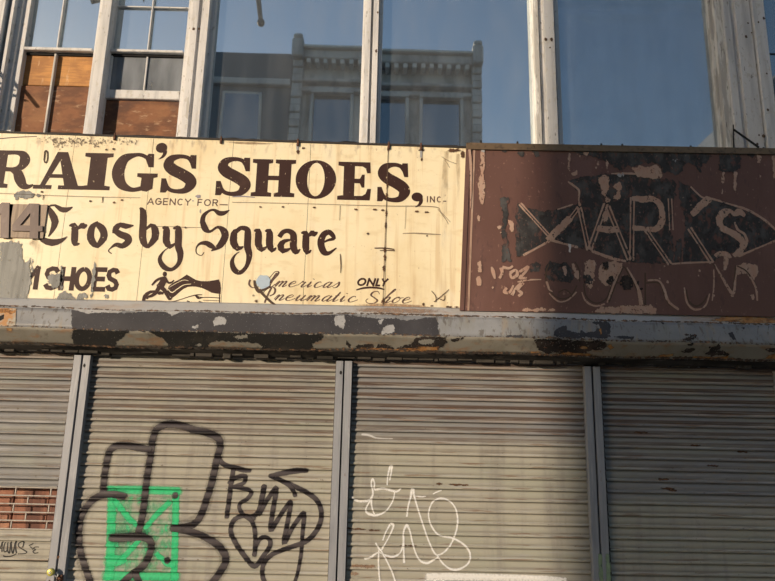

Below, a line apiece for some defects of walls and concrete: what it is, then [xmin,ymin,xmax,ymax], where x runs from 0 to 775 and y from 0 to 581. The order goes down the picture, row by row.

peeling [14,190,40,200]
peeling [468,149,486,208]
peeling [568,134,765,222]
peeling [0,240,34,299]
peeling [476,197,643,297]
peeling [723,256,759,280]
peeling [47,262,464,352]